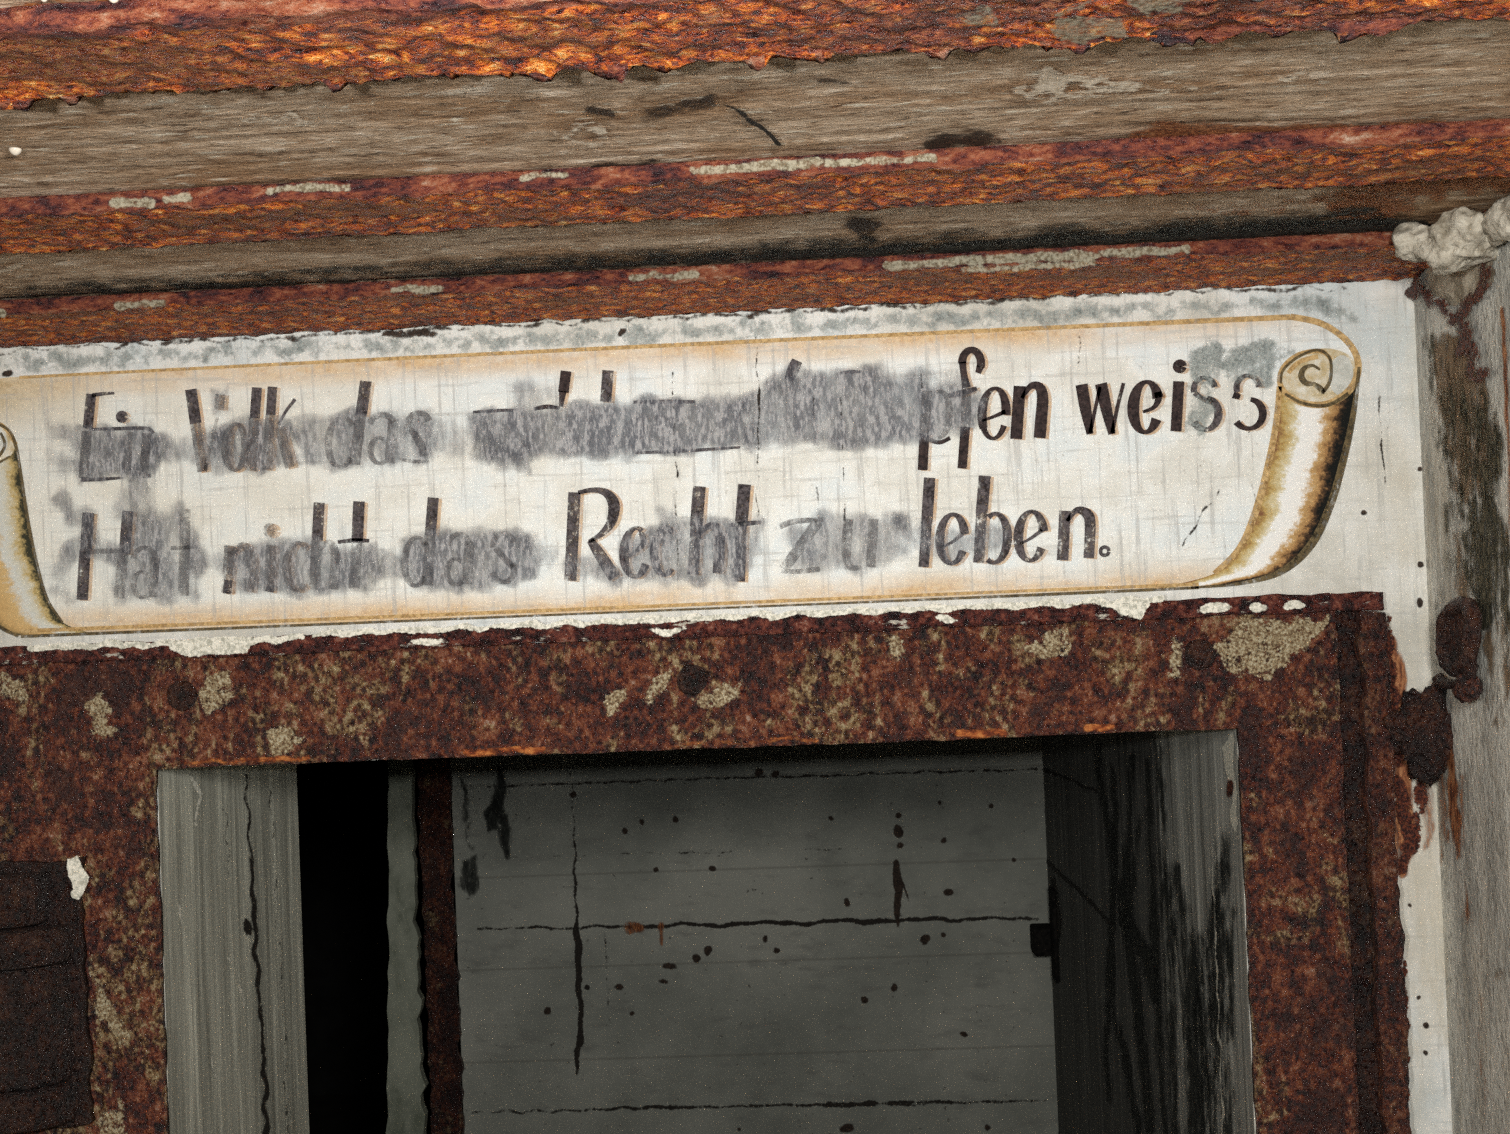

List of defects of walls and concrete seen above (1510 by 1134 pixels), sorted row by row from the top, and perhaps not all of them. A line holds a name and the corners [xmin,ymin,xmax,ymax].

rust [924,131,1002,149]
rust [1089,286,1300,297]
rust [482,295,1066,336]
rust [115,325,464,350]
leakage [1423,334,1510,699]
rust [1386,616,1407,711]
rust [463,746,545,756]
rust [955,729,1007,738]
rust [1084,724,1115,732]
rust [1394,749,1464,878]
crack [469,768,1114,1114]
leakage [1094,746,1234,1134]